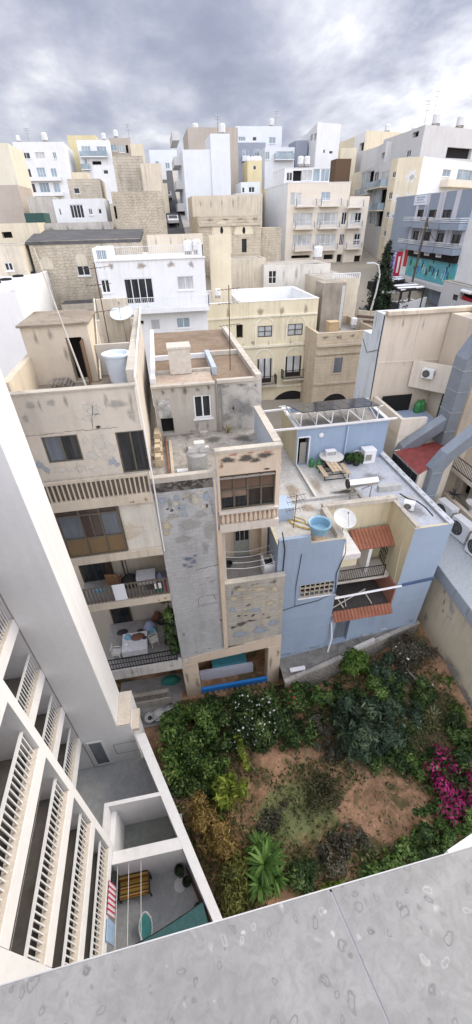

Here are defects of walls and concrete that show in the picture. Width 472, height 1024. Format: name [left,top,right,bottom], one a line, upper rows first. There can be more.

crack [32,406,116,436]
peeling [159,491,213,568]